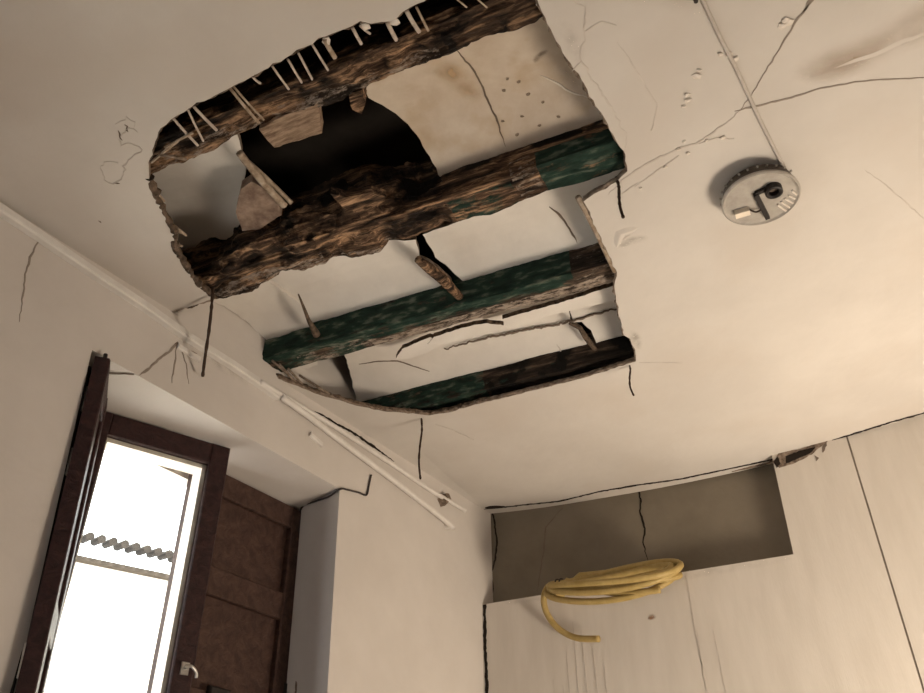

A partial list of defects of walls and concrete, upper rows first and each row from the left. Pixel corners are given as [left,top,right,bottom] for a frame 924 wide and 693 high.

spalling [100,102,218,185]
spalling [210,3,429,124]
spalling [535,0,627,221]
crack [457,0,924,197]
crack [19,242,39,322]
spalling [146,174,216,299]
spalling [271,259,636,415]
crack [833,412,924,440]
crack [483,459,773,693]